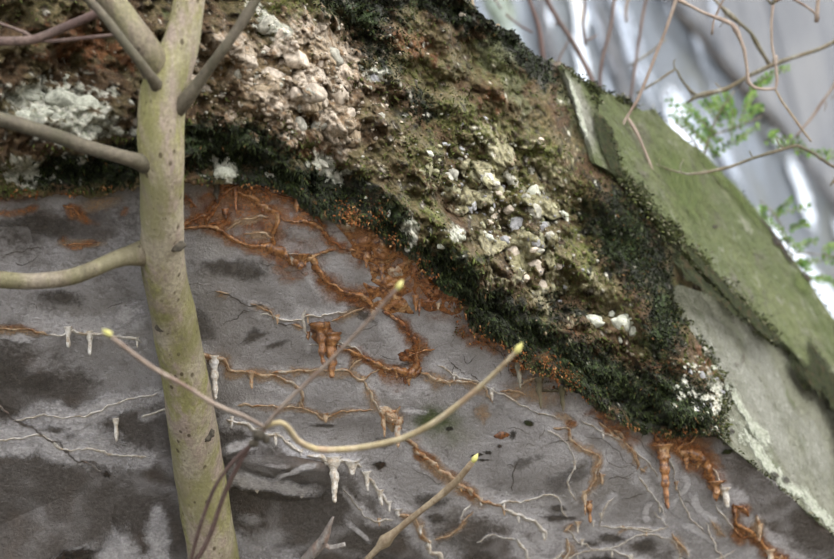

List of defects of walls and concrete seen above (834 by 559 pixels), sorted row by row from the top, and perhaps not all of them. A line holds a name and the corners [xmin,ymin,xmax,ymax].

damp [0,301,147,355]
crack [189,283,294,326]
corrosion [184,180,640,445]
damp [204,341,381,427]
crack [0,401,110,478]
damp [0,390,157,468]
corrosion [493,430,516,448]
damp [343,365,691,559]
crack [435,338,742,559]
corrosion [652,427,726,502]
damp [55,522,171,559]
corrosion [731,503,789,559]